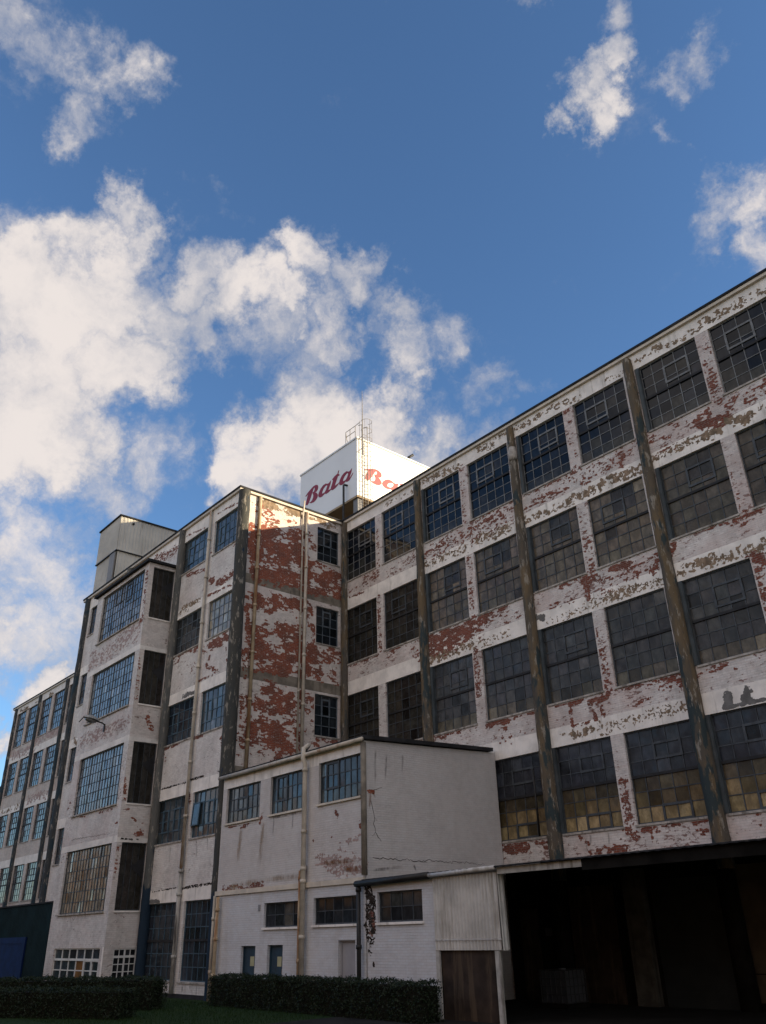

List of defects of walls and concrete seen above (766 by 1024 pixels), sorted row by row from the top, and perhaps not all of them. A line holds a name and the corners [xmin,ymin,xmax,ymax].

peeling [634,289,766,363]
peeling [236,342,766,761]
peeling [315,820,369,878]
crack [371,787,485,865]
peeling [502,840,548,860]
peeling [578,777,709,855]